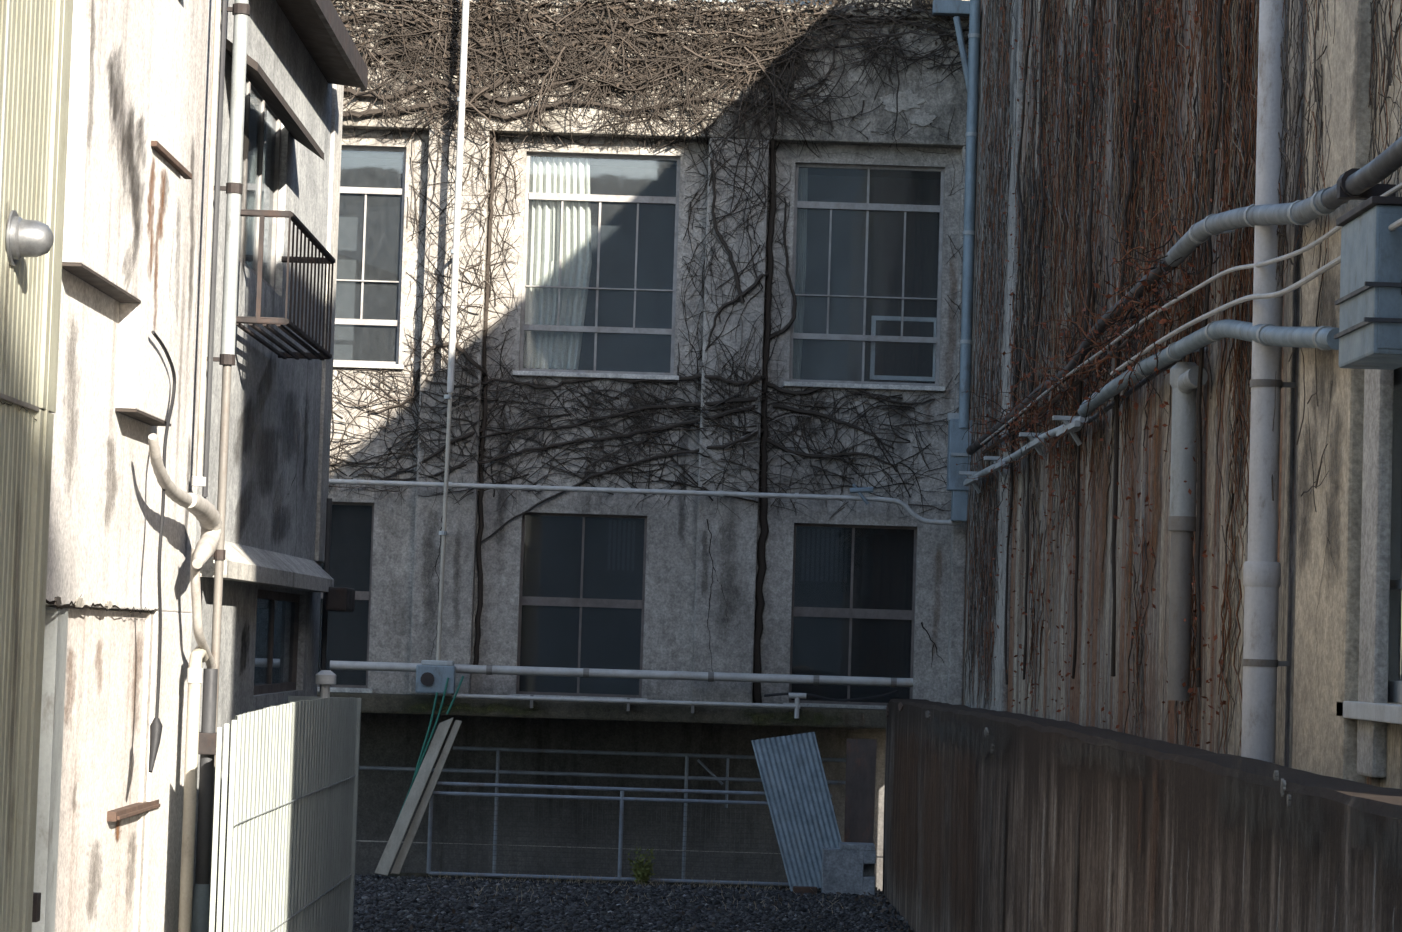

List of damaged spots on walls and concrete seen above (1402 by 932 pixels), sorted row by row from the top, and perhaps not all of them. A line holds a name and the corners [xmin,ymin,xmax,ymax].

flaking render [755,66,873,112]
flaking render [879,88,937,126]
damp [109,63,144,253]
corrosion [148,160,165,324]
damp [237,491,250,532]